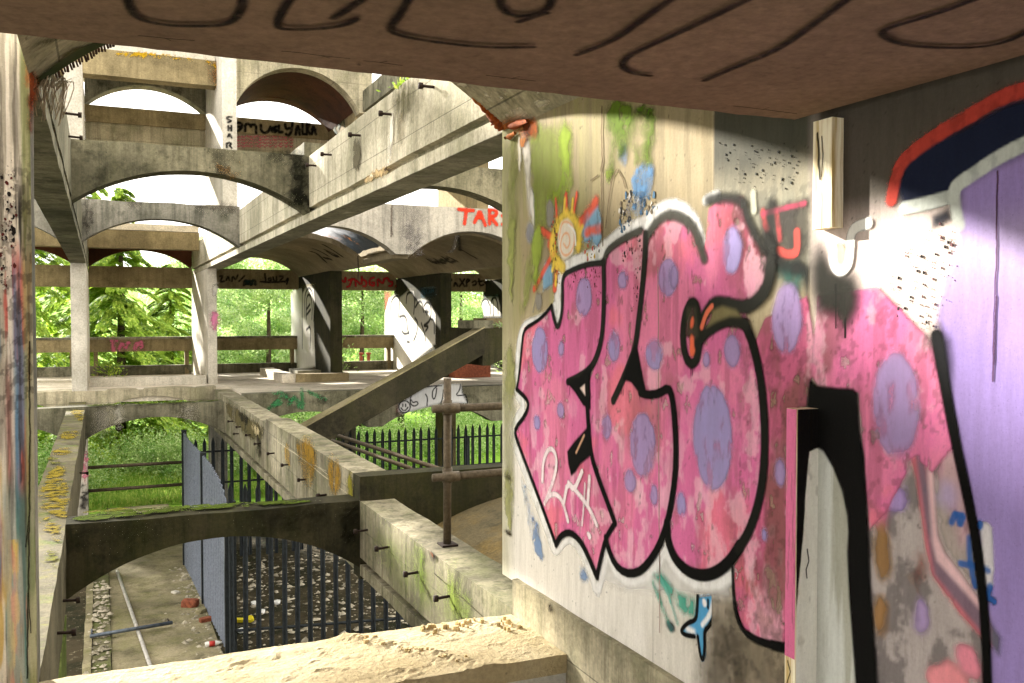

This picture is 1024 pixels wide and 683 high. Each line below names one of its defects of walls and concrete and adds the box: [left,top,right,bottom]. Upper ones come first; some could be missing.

rust [472,98,537,147]
water stain [274,151,311,211]